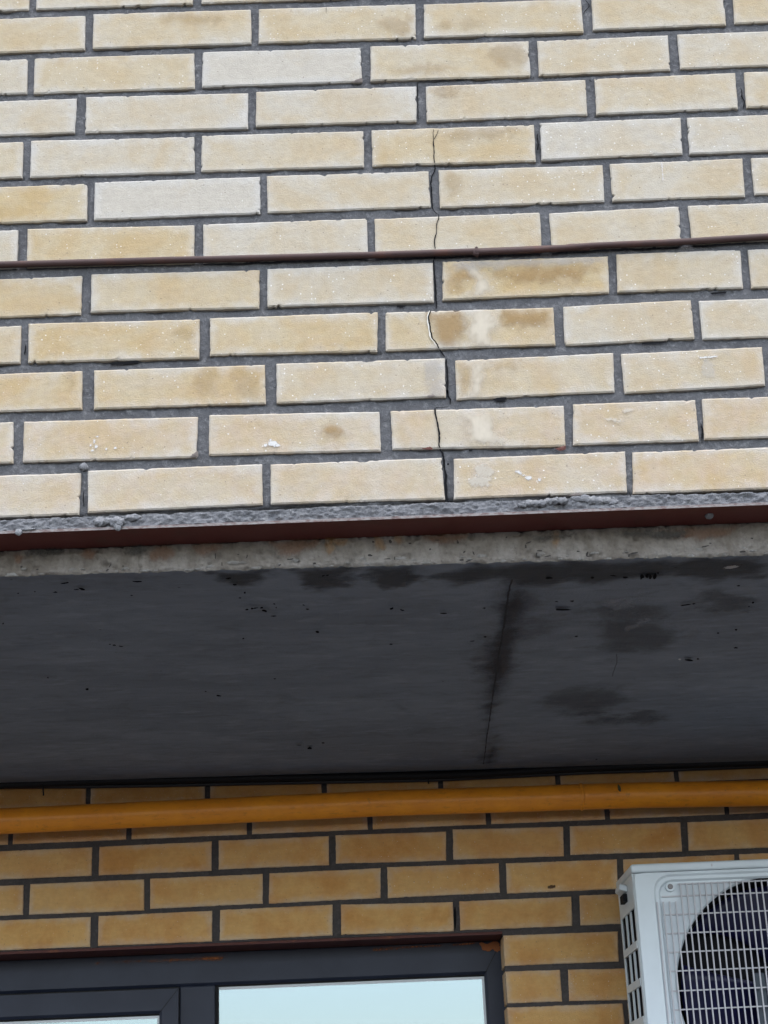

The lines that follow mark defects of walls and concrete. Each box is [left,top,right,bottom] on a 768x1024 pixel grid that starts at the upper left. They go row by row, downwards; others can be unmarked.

crack [417,77,519,502]
leakage [208,572,261,585]
leakage [300,567,351,588]
leakage [374,569,419,588]
leakage [440,559,763,584]
crack [483,580,520,764]